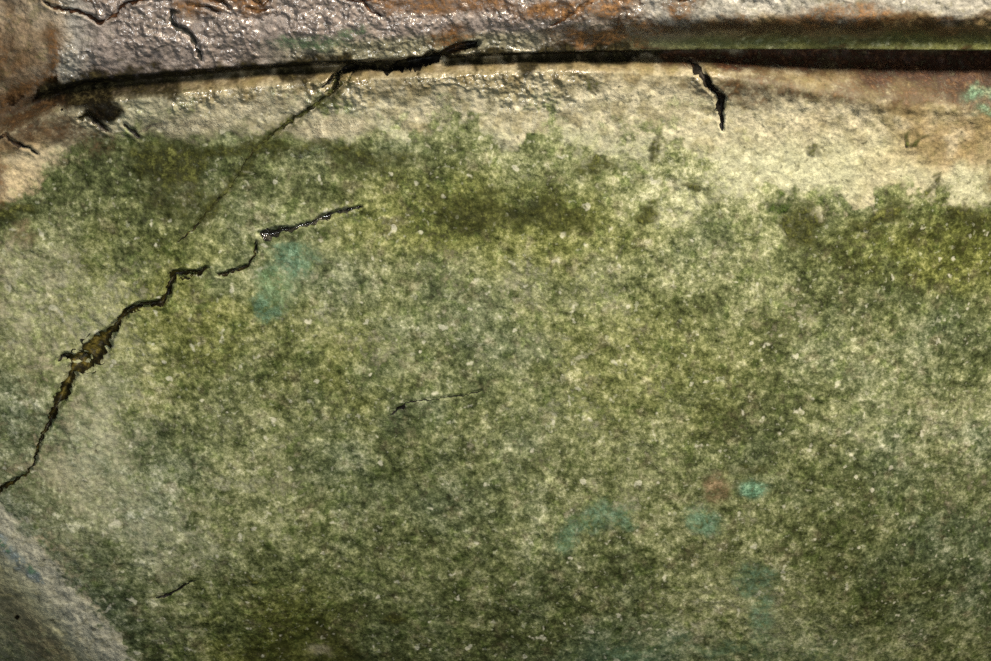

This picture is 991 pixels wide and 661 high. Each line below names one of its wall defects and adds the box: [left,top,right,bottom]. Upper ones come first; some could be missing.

crack [43,0,144,25]
crack [169,0,269,61]
crack [347,0,385,17]
corrosion [374,0,503,14]
corrosion [525,0,656,50]
leakage [0,41,991,149]
crack [687,59,725,131]
crack [0,134,38,155]
leakage [130,100,290,217]
crack [177,40,478,242]
crack [0,206,362,493]
leakage [738,482,766,497]